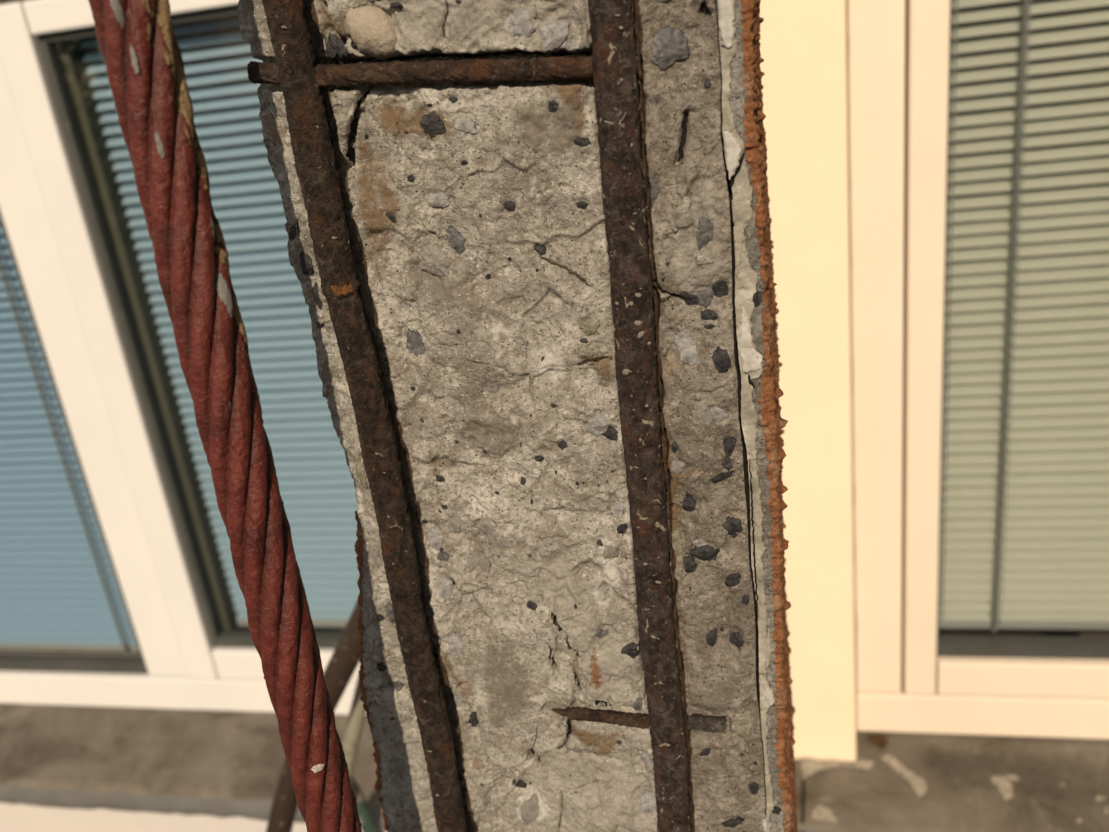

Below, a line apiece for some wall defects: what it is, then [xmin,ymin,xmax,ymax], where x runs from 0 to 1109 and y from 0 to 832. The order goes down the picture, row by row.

crack [349,1,592,61]
flaking render [717,0,736,49]
crack [346,88,373,166]
corrosion [338,140,399,350]
flaking render [723,131,753,277]
flaking render [740,307,763,373]
corrosion [633,0,695,832]
crack [700,0,767,832]
corrosion [389,379,478,832]
crack [531,612,613,761]
spalling [510,551,638,707]
corrosion [573,727,618,754]